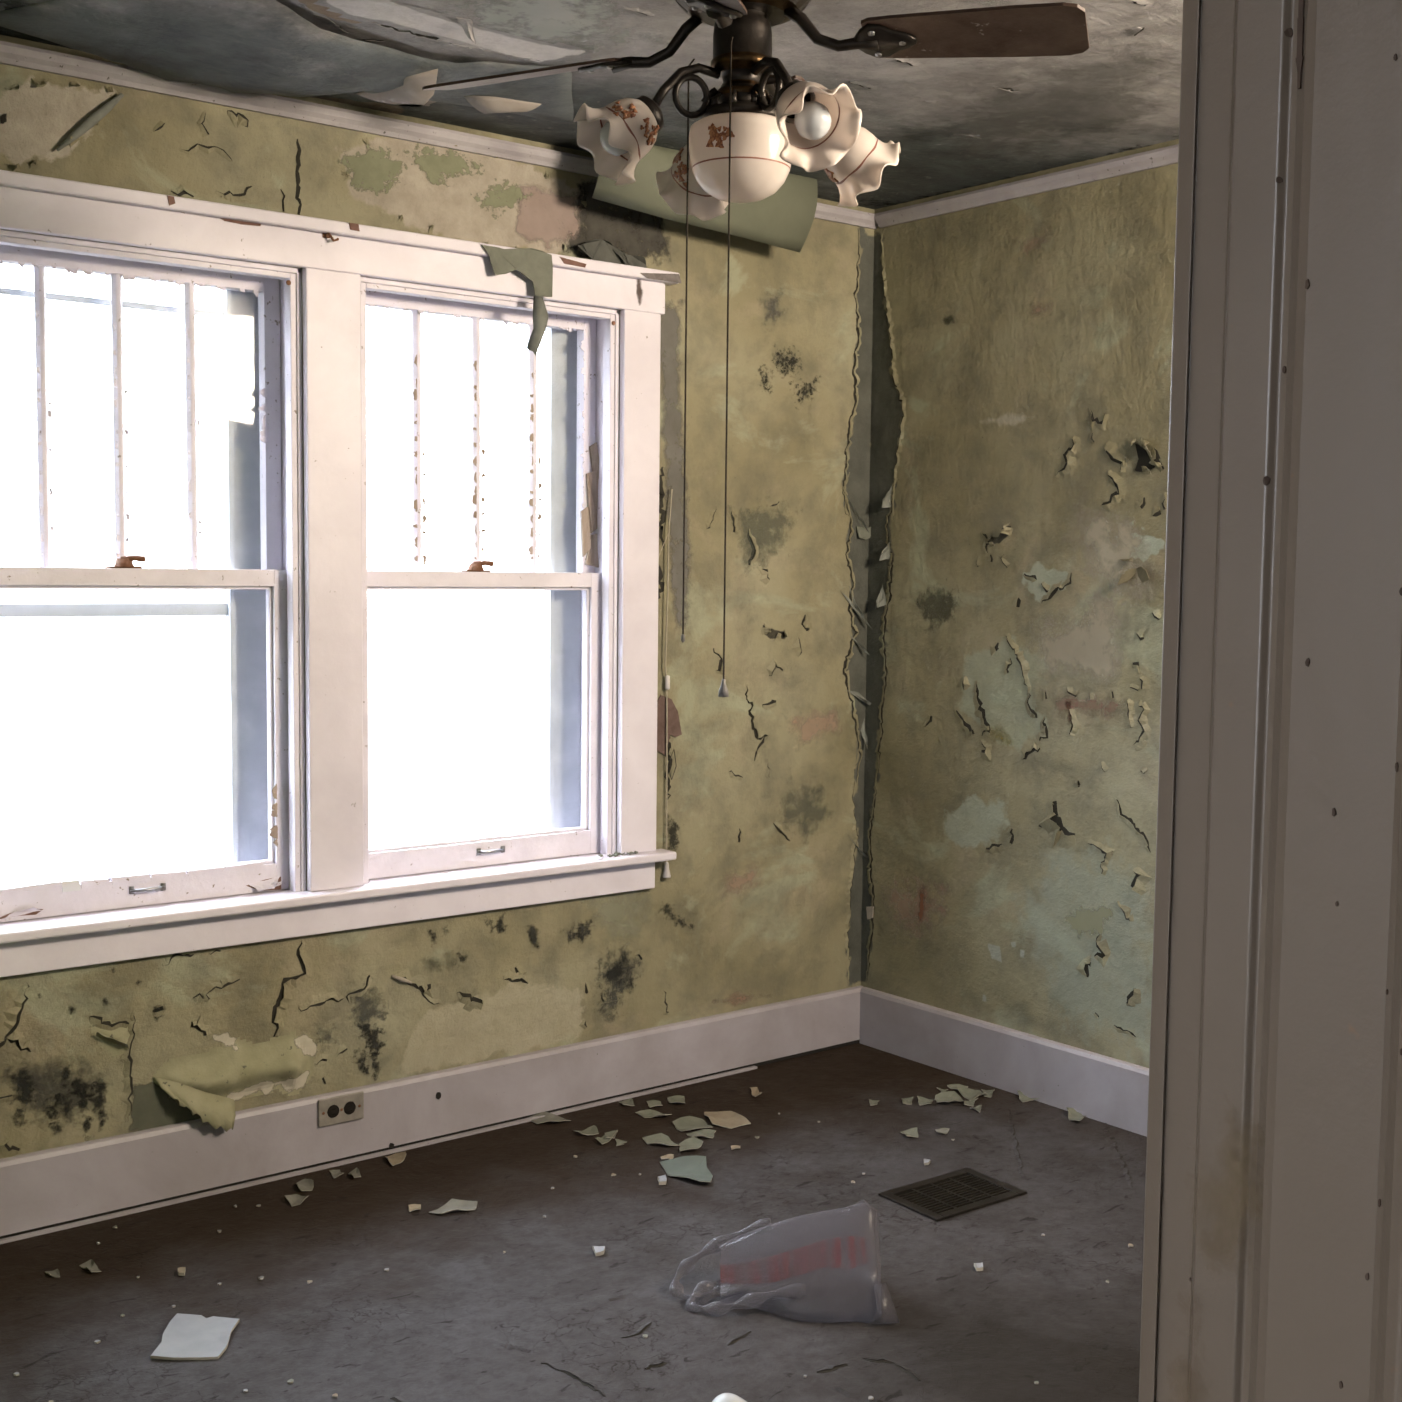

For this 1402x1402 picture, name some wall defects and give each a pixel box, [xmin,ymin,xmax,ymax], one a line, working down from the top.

water stain [458,0,629,47]
spalling [0,69,124,173]
crack [153,110,302,215]
water stain [567,180,669,260]
peeling [837,225,908,989]
peeling [951,626,1061,762]
crack [924,532,1161,977]
peeling [930,781,1157,1068]
crack [89,947,240,1122]
mould [350,989,384,1080]
crack [272,940,529,1037]
mould [7,1065,107,1132]